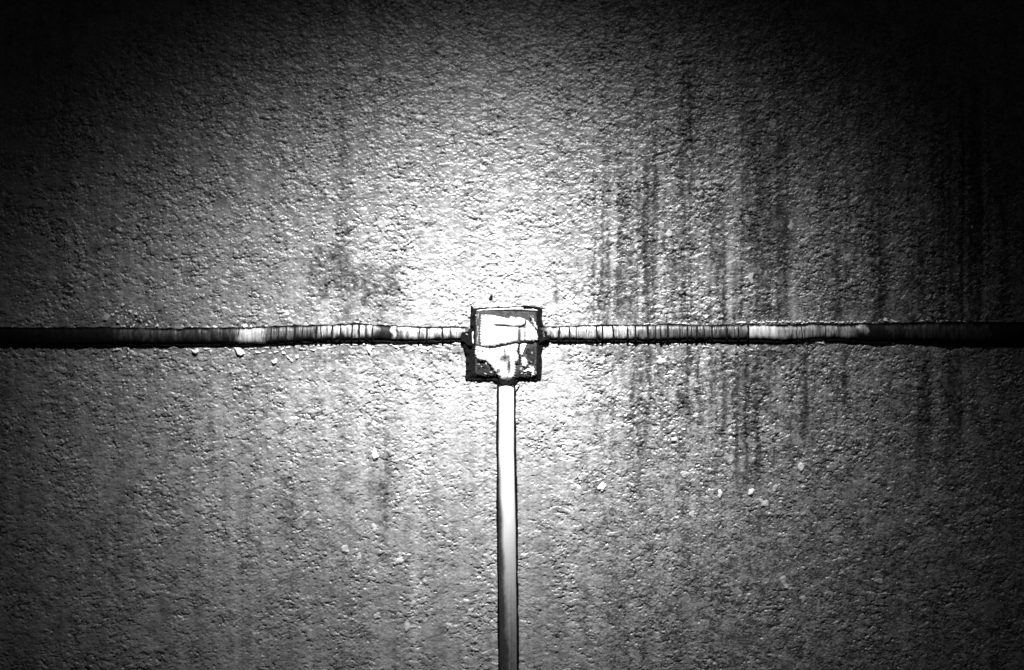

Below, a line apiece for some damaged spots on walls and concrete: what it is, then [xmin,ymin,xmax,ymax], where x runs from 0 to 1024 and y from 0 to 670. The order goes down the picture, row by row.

damp [597,149,665,324]
damp [710,234,737,321]
damp [741,160,796,324]
damp [677,348,699,417]
damp [714,351,786,472]